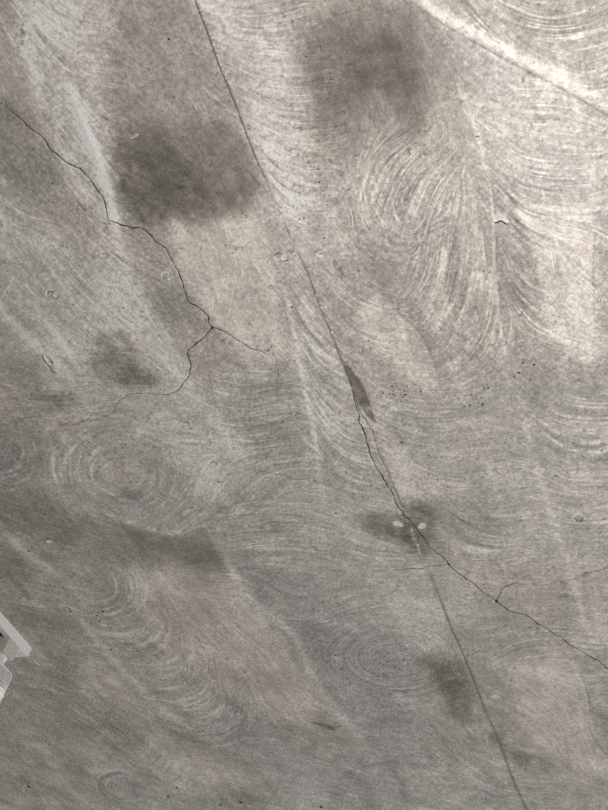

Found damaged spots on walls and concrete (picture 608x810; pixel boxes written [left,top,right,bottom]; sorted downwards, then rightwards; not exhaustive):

crack [0,109,300,426]
damp [346,366,375,422]
crack [219,369,608,669]